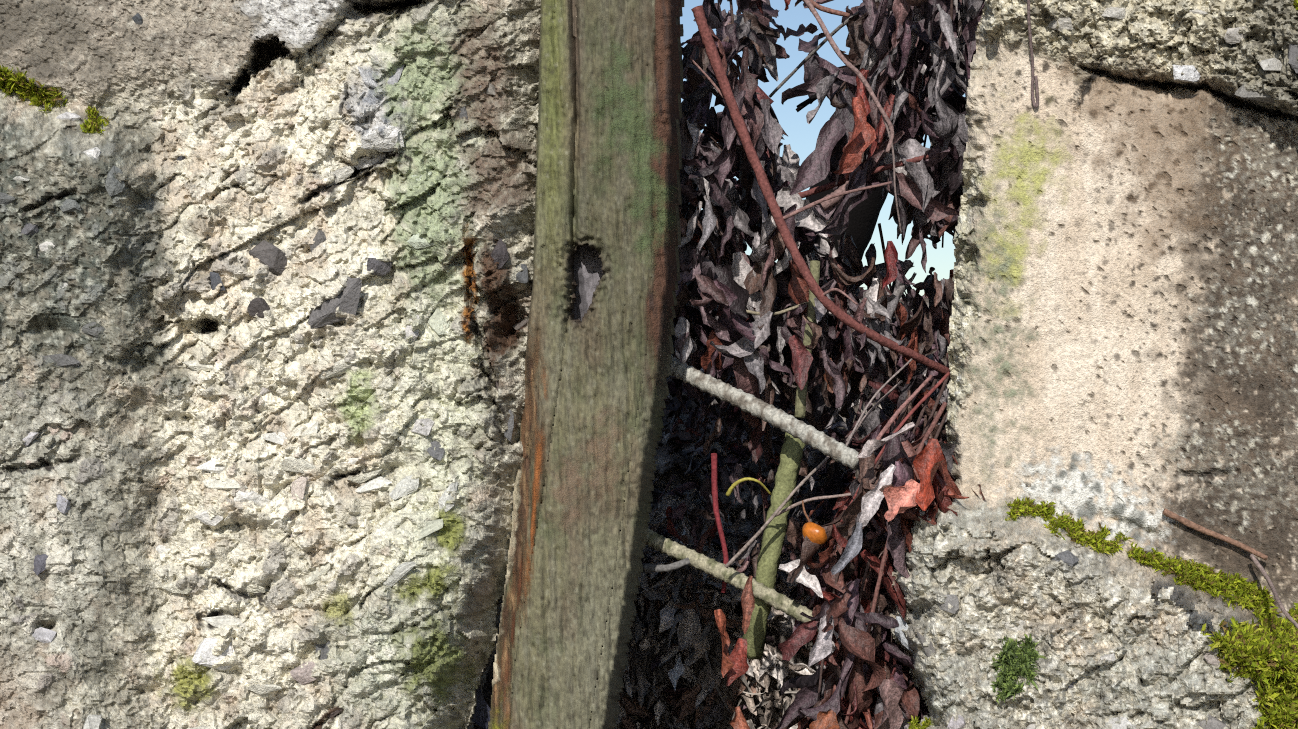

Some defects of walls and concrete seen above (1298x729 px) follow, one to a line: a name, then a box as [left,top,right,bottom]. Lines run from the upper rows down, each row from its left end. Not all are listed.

corrosion [462,236,518,367]
damp [1018,95,1298,611]